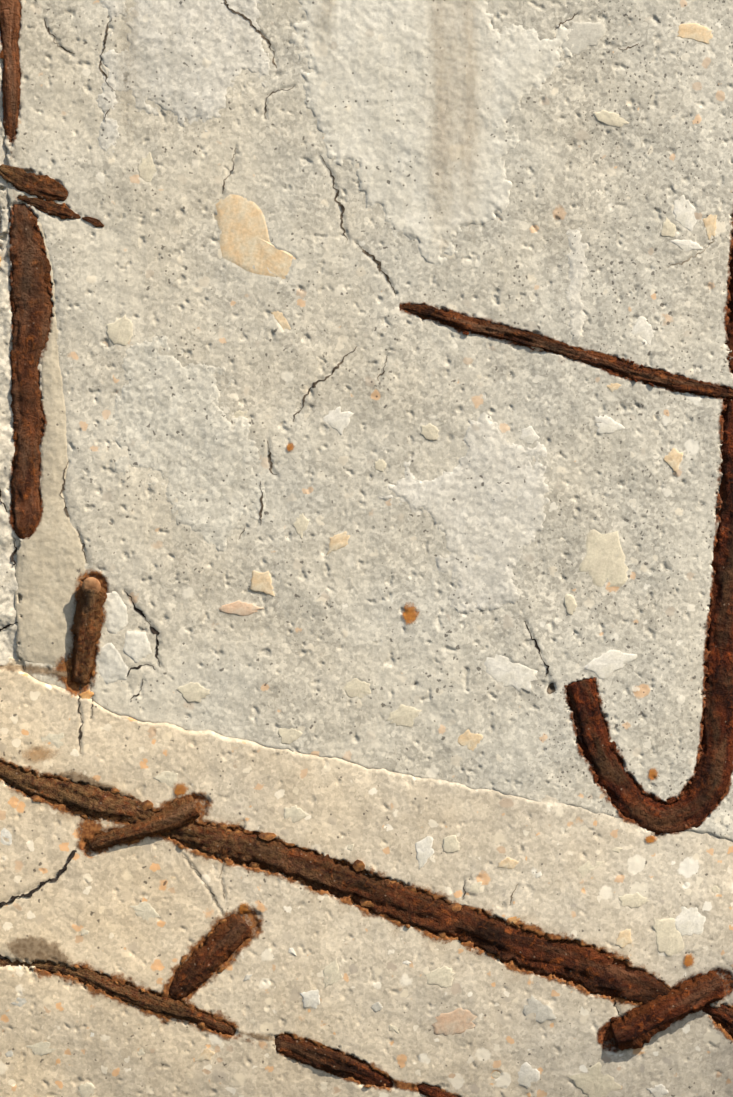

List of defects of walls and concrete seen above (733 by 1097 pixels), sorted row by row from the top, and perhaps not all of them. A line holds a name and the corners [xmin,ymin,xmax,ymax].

crack [225,0,295,117]
crack [321,156,395,293]
corrosion [724,214,733,373]
corrosion [9,274,53,539]
corrosion [400,302,733,803]
corrosion [54,570,108,696]
corrosion [0,749,72,782]
corrosion [564,683,731,843]
crack [0,848,77,908]
corrosion [0,779,643,1053]
corrosion [403,884,733,1008]
corrosion [278,1033,392,1091]